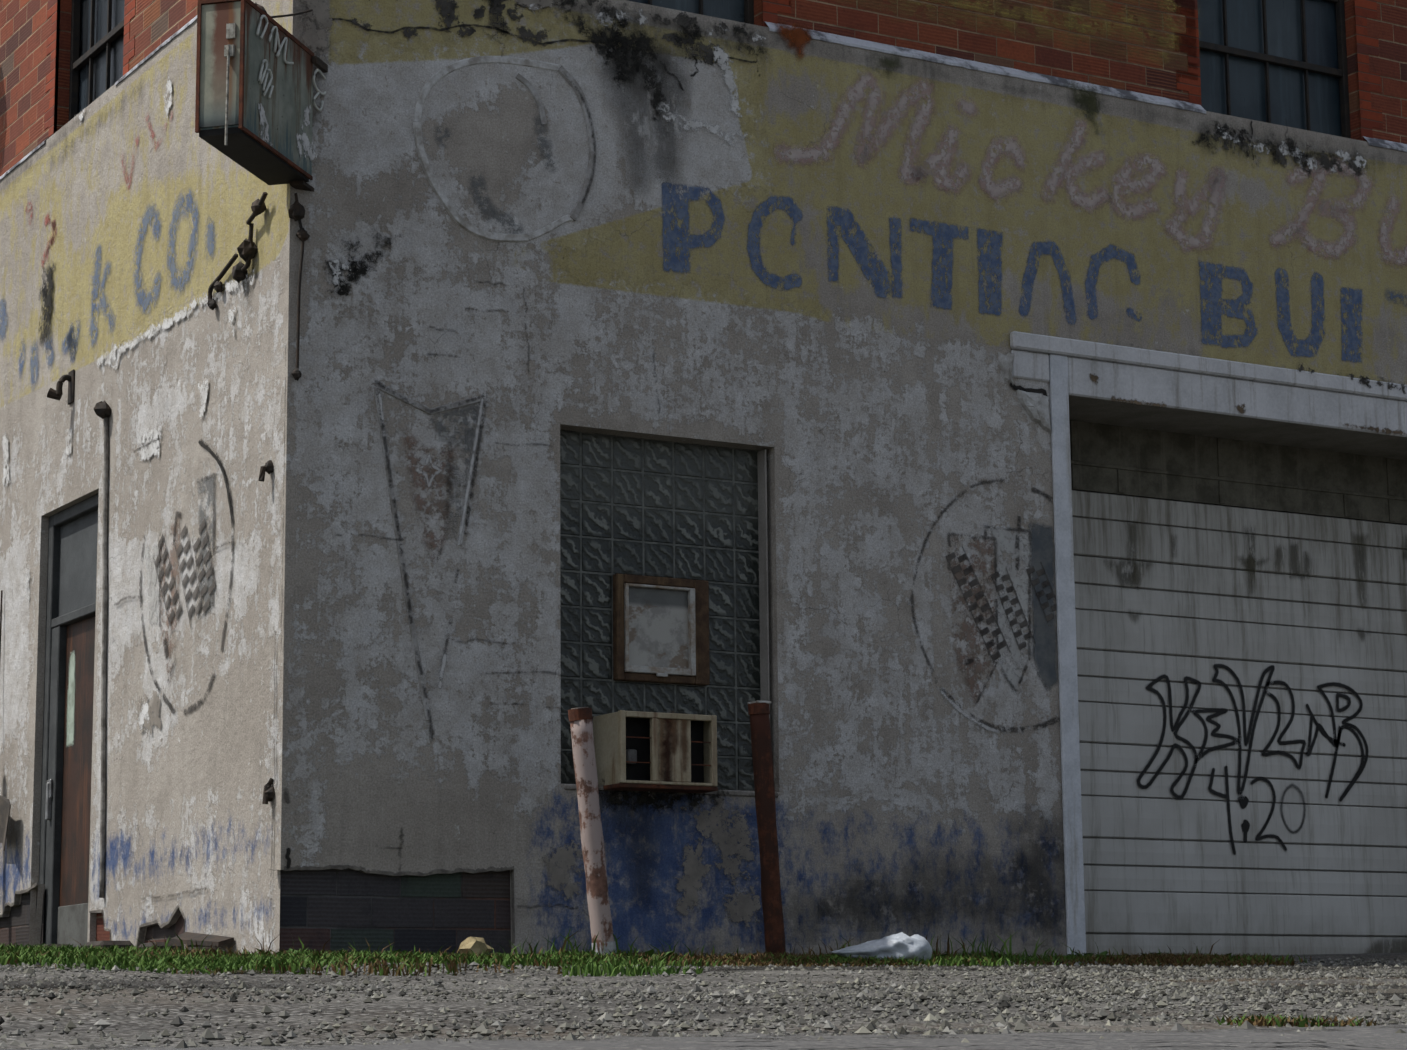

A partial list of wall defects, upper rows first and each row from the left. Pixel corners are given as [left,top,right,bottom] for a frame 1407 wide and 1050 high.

leakage [560,0,666,120]
leakage [680,35,729,67]
spalling [89,909,111,941]
spalling [136,904,216,948]